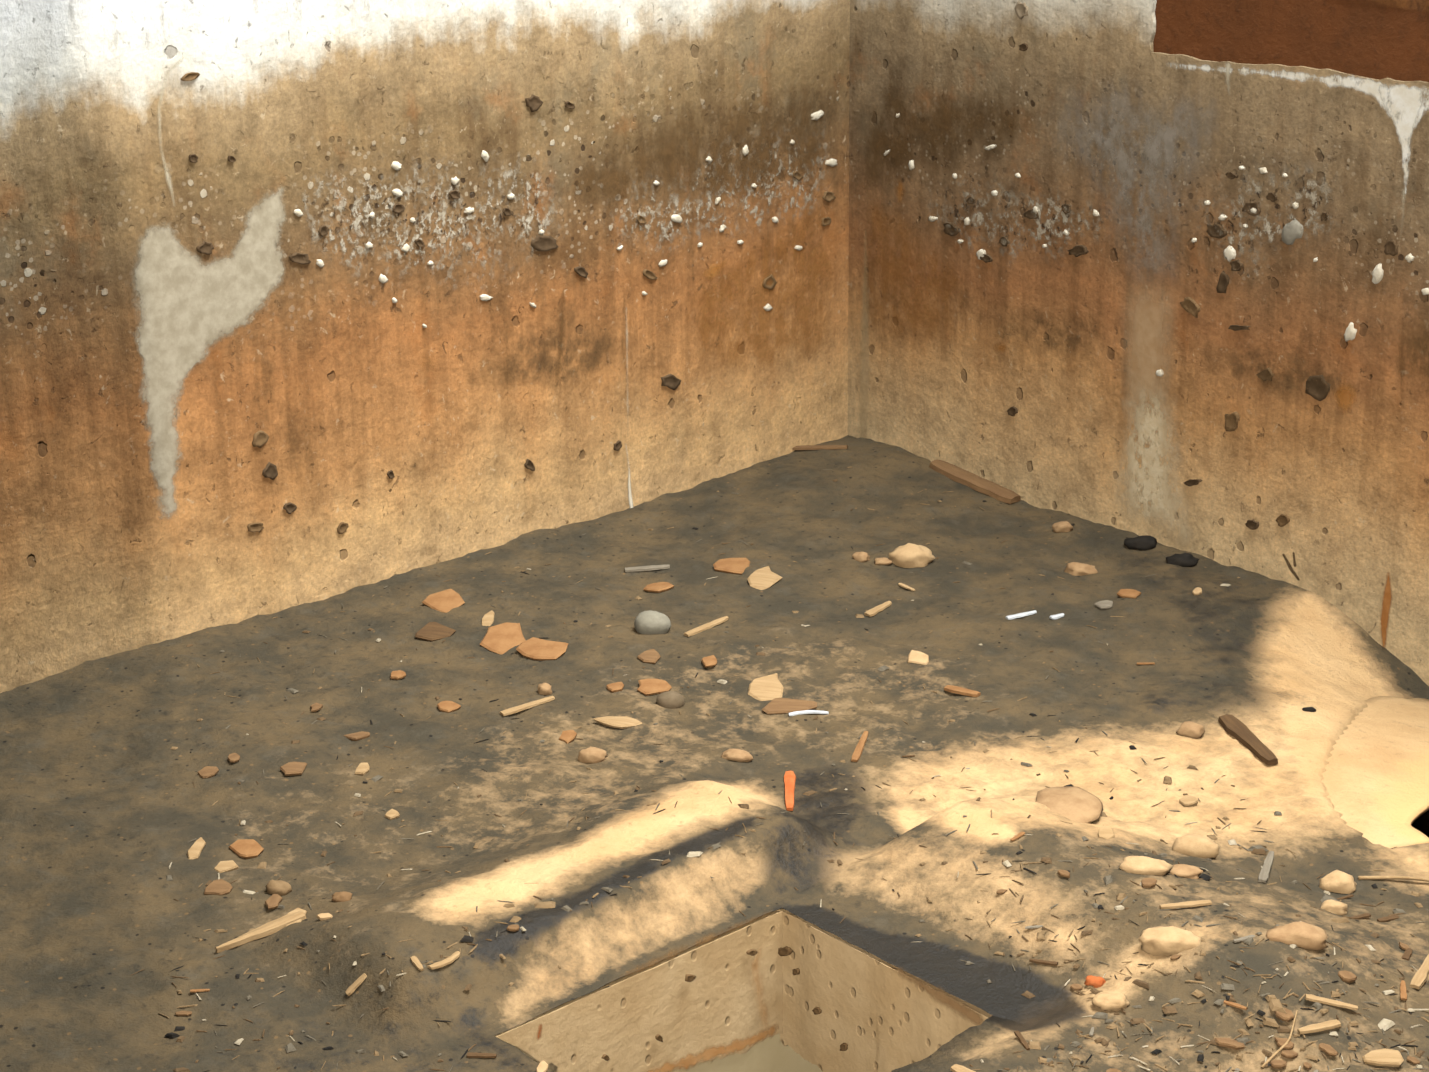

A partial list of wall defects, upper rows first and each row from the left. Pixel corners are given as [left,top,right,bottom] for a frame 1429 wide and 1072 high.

damp [578,101,818,194]
damp [871,92,1015,170]
damp [1091,109,1184,243]
efflorescence [1176,64,1429,193]
damp [1129,303,1174,518]
corrosion [1381,574,1391,647]